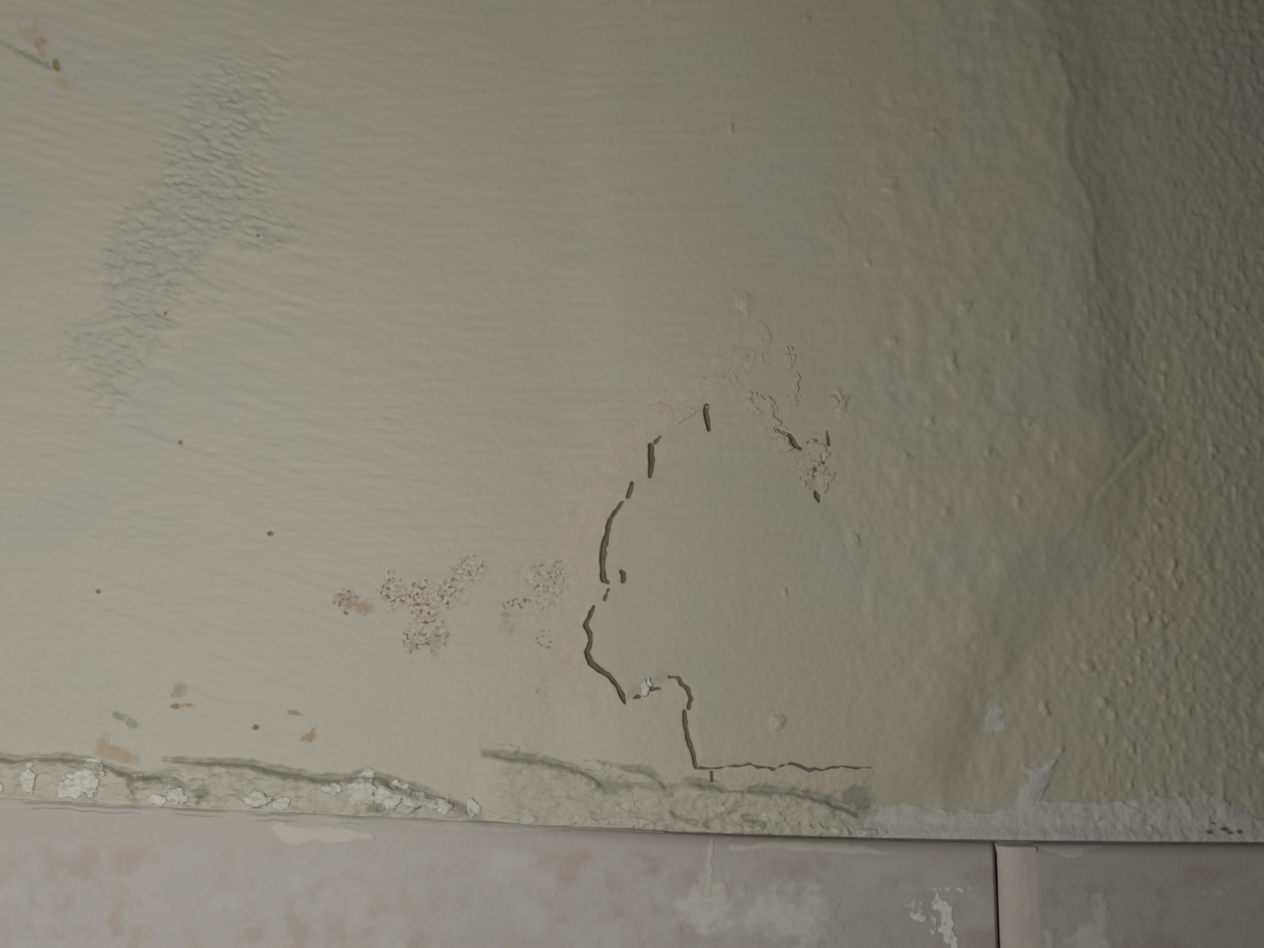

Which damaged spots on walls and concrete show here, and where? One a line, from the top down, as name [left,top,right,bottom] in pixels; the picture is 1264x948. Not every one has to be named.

peeling [0,319,888,839]
crack [703,403,711,432]
crack [583,428,872,783]